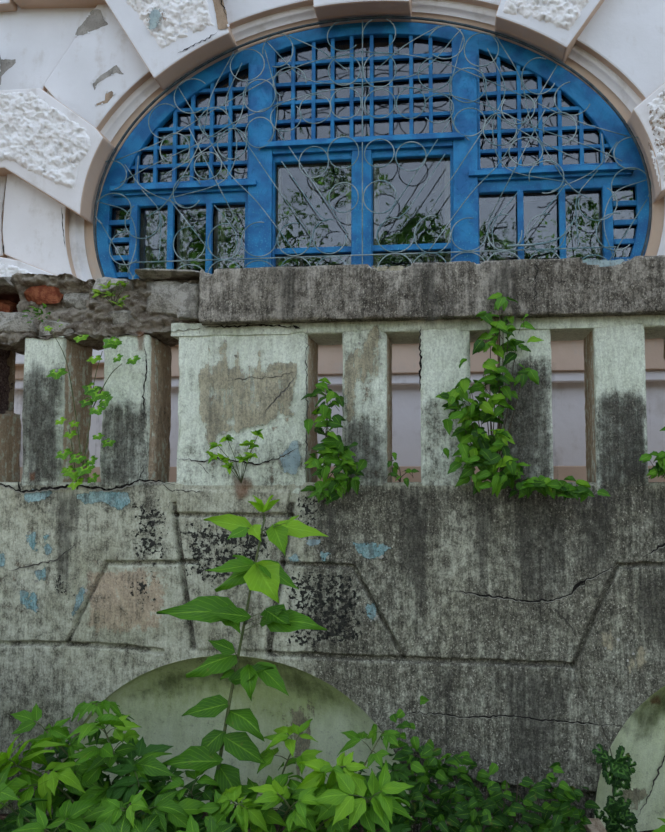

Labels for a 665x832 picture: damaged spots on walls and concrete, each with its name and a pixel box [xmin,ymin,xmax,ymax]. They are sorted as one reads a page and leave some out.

peeling [73,9,108,37]
peeling [0,57,16,85]
peeling [95,91,115,106]
peeling [91,65,123,90]
spalling [0,269,212,355]
crack [0,324,309,494]
leakage [601,395,644,481]
leakage [130,495,170,610]
leakage [180,522,270,588]
crack [642,543,665,559]
crack [450,566,614,635]
crack [640,755,665,813]